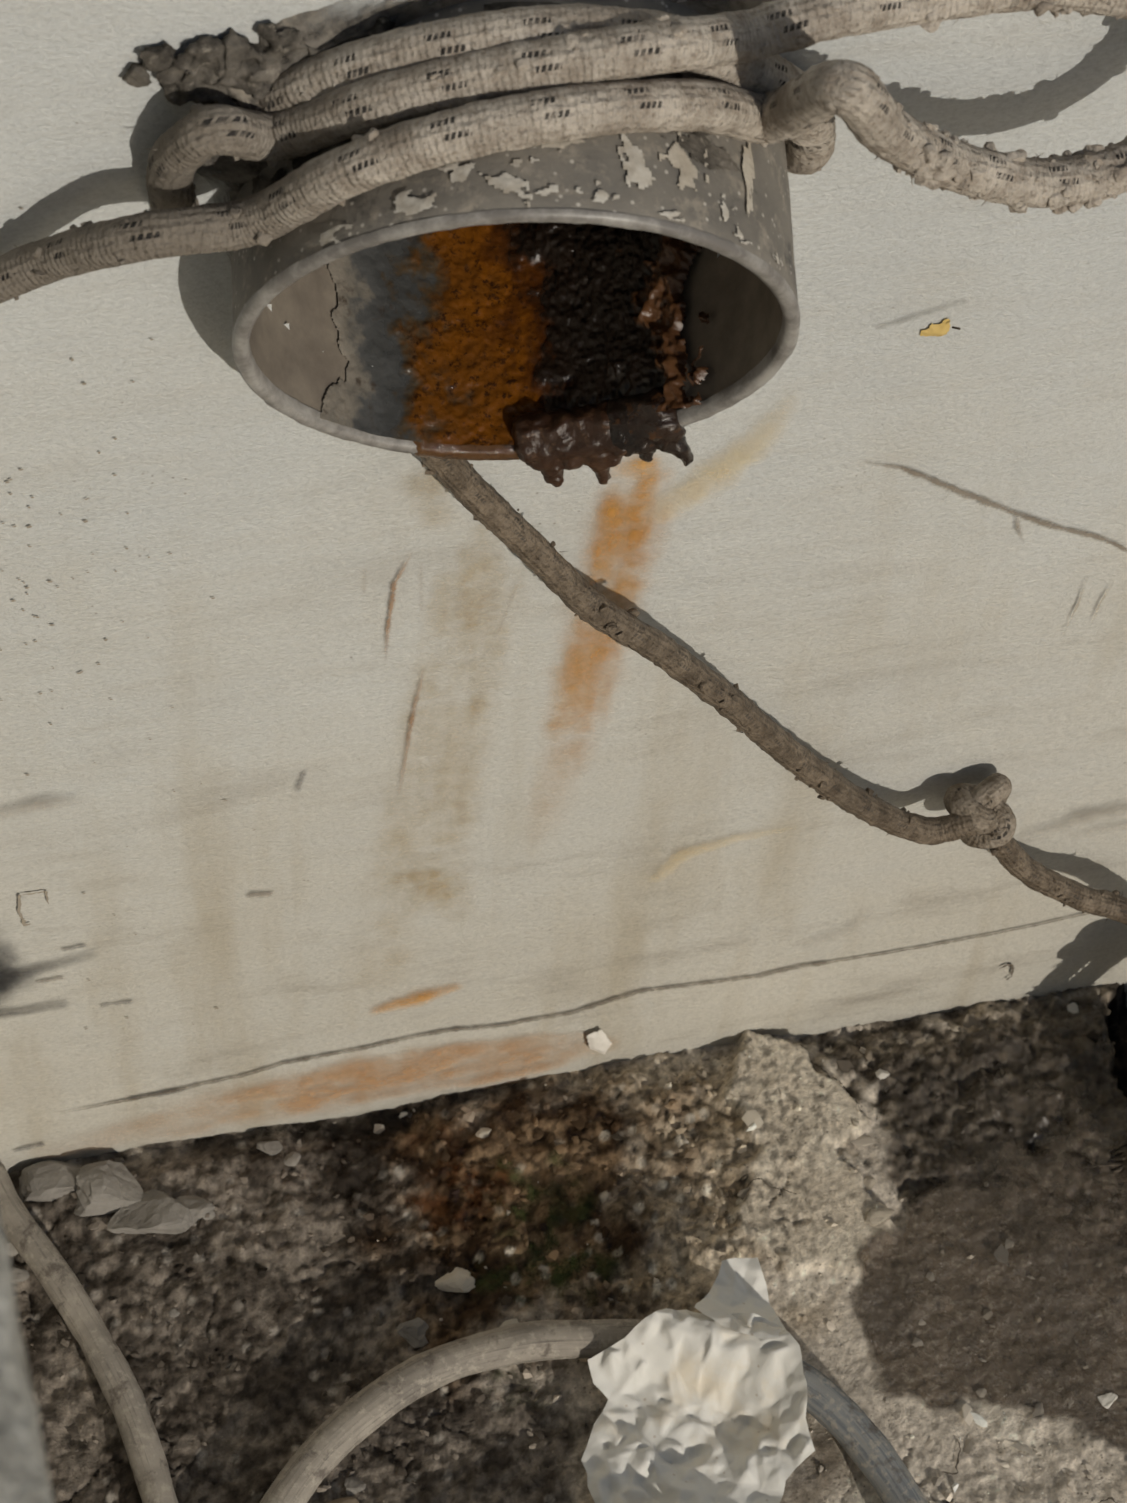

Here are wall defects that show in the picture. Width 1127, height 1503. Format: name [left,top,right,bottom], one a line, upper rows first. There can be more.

peeling [319,224,353,246]
peeling [393,190,437,216]
peeling [438,132,709,207]
peeling [660,211,685,222]
peeling [721,142,755,245]
rust [391,222,574,446]
rust [594,460,654,558]